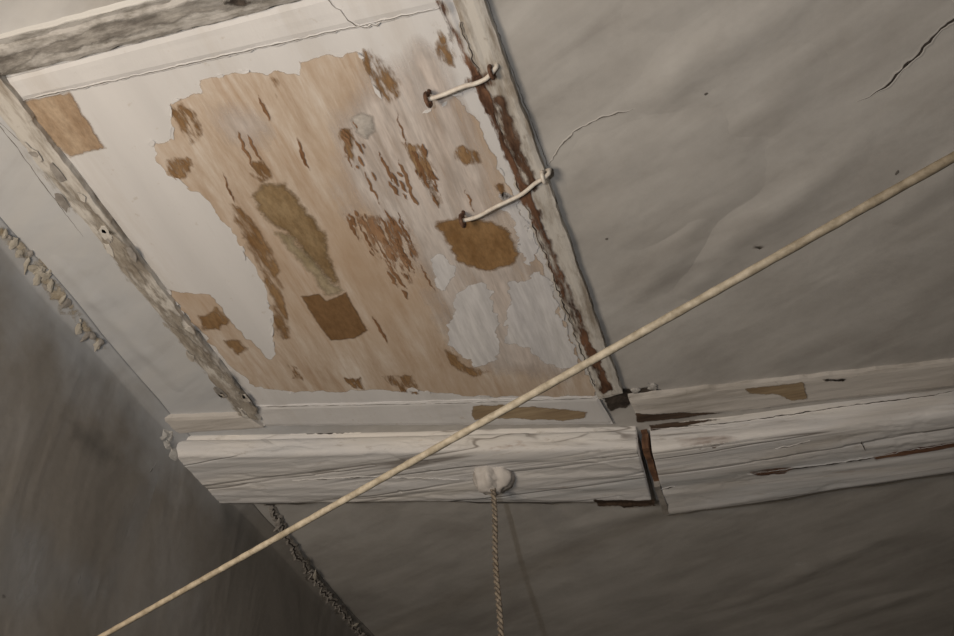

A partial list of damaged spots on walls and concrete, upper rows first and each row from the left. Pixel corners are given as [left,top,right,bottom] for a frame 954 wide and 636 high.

crack [857,15,954,102]
spalling [0,228,104,352]
peeling [148,46,658,421]
rust [436,0,613,394]
peeling [745,382,807,401]